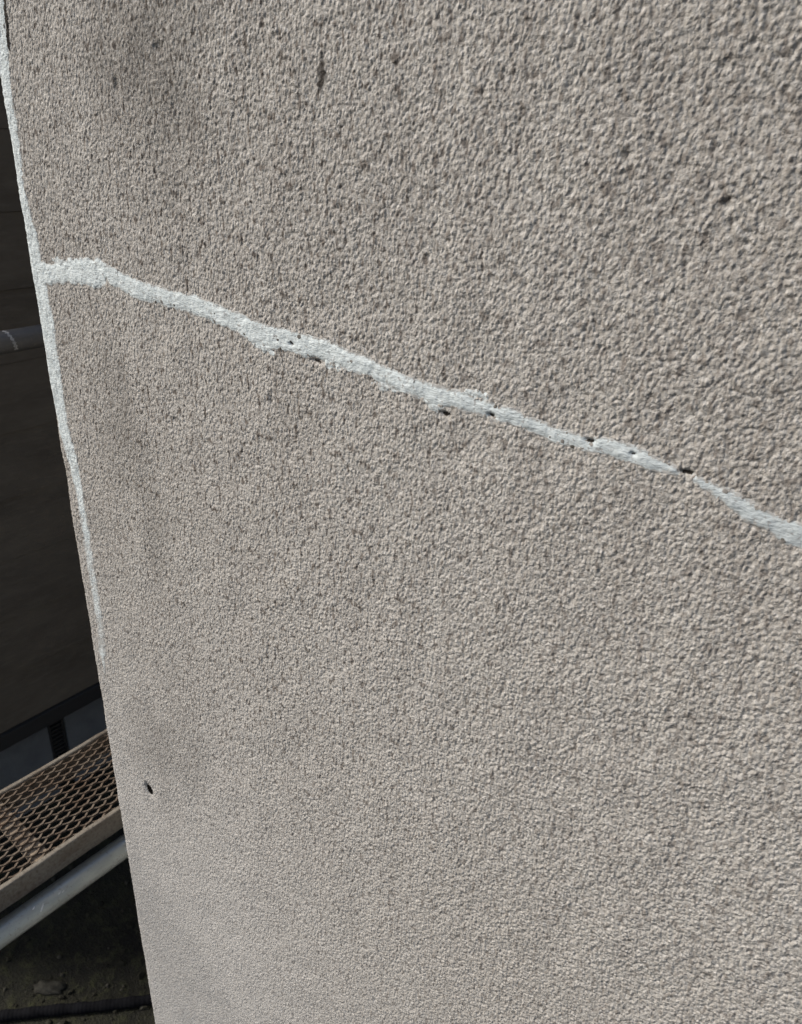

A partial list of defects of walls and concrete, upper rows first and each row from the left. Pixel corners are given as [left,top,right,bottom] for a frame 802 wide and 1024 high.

crack [0,0,802,675]